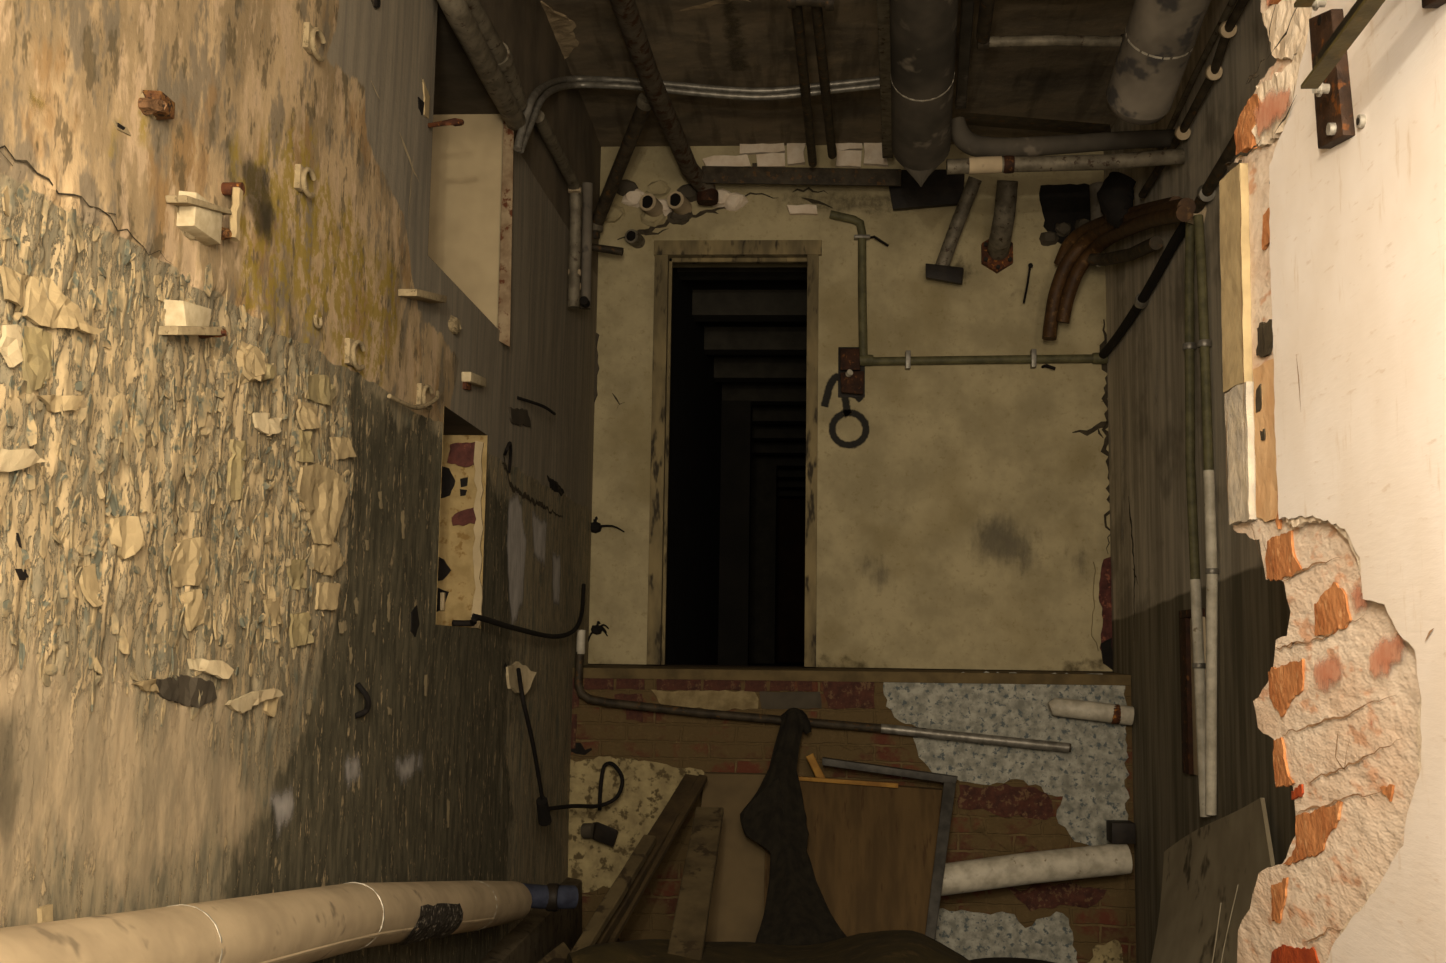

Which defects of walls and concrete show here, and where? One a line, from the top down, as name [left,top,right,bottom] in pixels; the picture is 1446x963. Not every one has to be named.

crack [0,145,172,264]
peeling [0,179,359,727]
spalling [1219,0,1422,923]
spalling [410,605,420,637]
spalling [436,557,451,612]
spalling [441,441,484,628]
peeling [568,557,1130,893]
peeling [935,882,1123,963]
spalling [1270,882,1381,963]